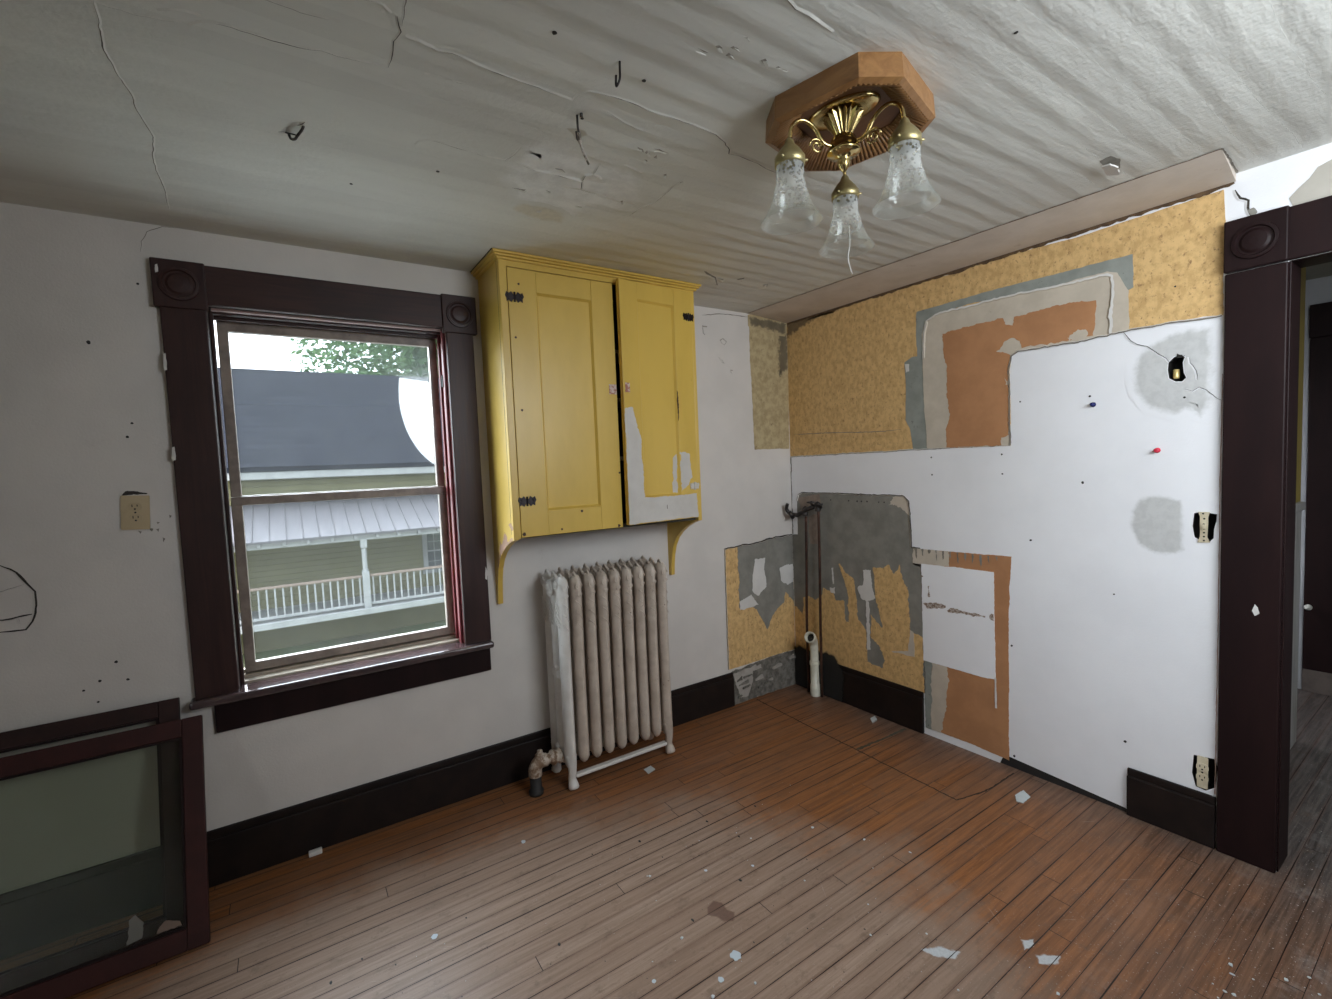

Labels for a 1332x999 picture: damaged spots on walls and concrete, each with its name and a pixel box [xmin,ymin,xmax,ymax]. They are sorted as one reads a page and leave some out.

crack [86,0,798,209]
crack [787,0,834,32]
peeling [748,182,1235,457]
flaking render [724,492,1011,760]